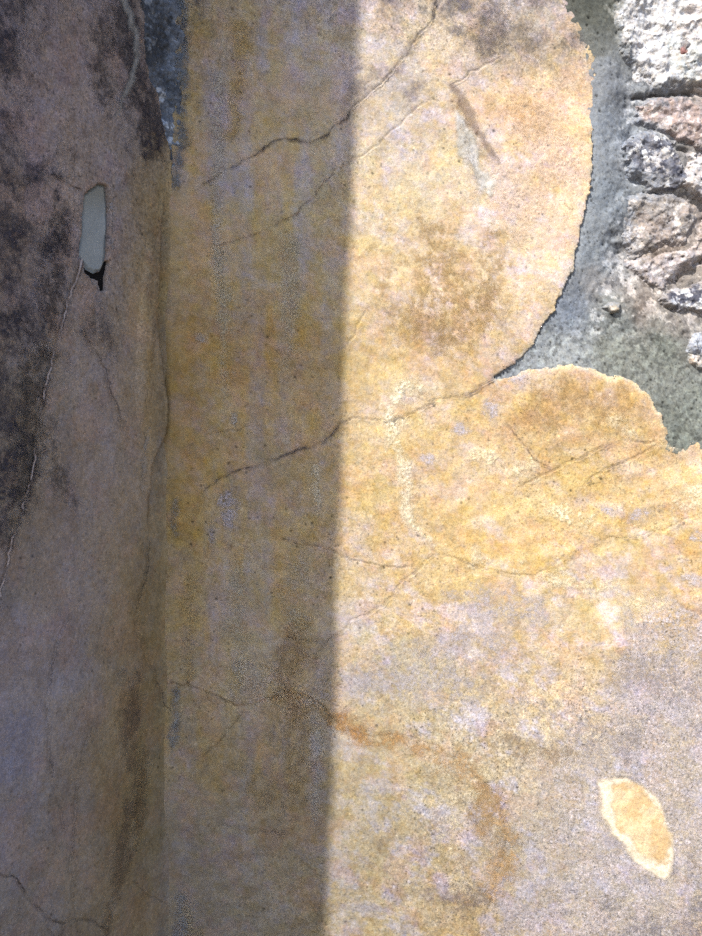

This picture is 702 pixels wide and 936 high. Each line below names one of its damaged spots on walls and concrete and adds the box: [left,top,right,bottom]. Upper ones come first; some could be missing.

crack [417,0,439,36]
crack [232,65,397,167]
spalling [495,0,702,454]
spalling [83,261,106,291]
crack [384,378,495,423]
crack [278,421,348,459]
peeling [542,599,702,936]